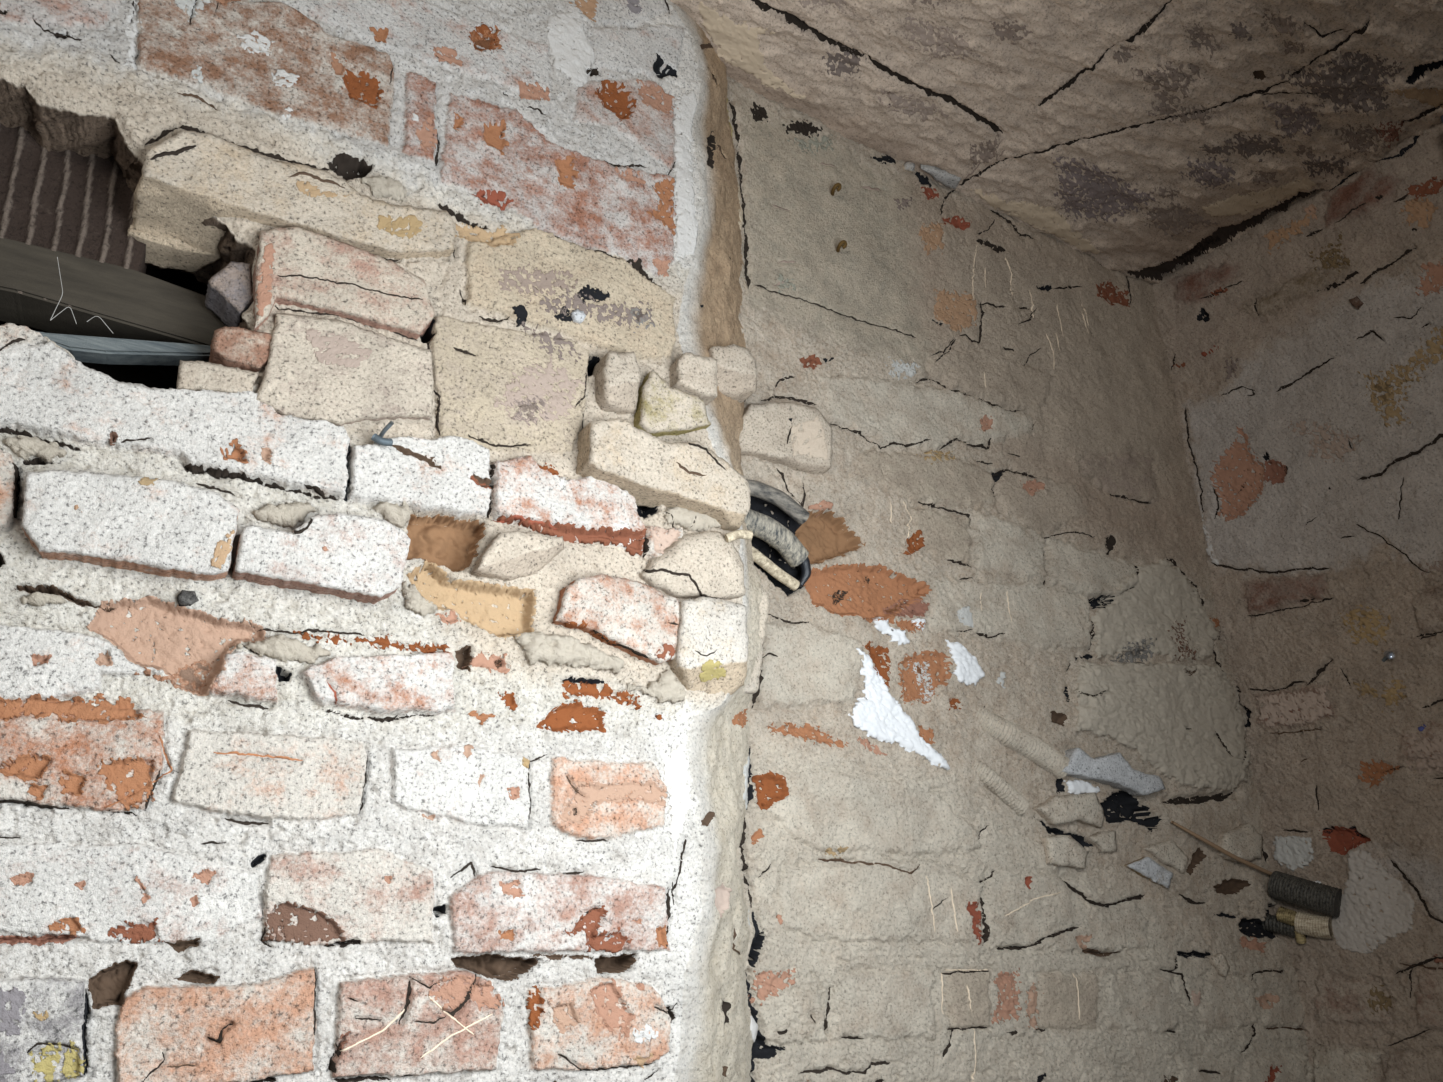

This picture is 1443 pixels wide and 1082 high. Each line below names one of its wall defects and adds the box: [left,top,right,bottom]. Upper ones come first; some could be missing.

crack [751,0,1370,215]
hole [82,362,179,389]
spalling [252,226,435,426]
spalling [537,369,833,531]
flaking render [492,514,681,557]
crack [1127,433,1443,617]
flaking render [86,595,267,696]
flaking render [536,680,663,733]
crack [752,614,809,708]
crack [732,746,771,1023]
crack [933,871,1144,975]
crack [798,987,890,1075]